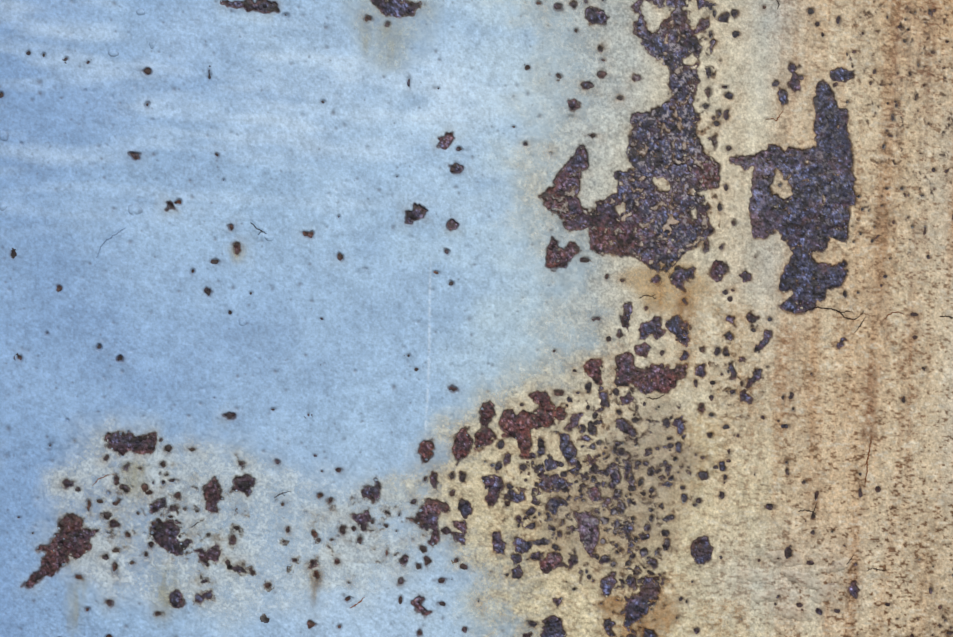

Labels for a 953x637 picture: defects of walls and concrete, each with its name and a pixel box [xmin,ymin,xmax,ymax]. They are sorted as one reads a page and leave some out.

peeling [539,0,857,314]
rust [380,0,953,637]
rust [47,437,431,614]